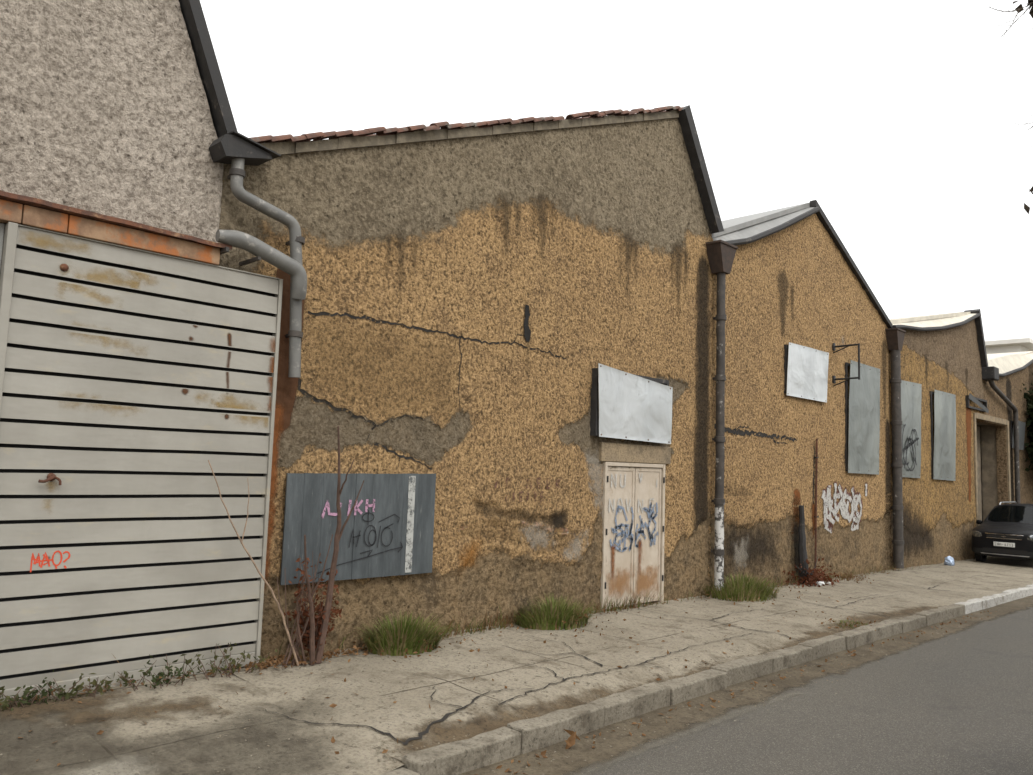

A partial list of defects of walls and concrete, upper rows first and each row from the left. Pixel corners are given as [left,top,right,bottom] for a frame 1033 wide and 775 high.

crack [308,311,566,410]
corrosion [253,268,305,587]
crack [298,378,441,470]
spalling [260,508,606,659]
corrosion [611,540,657,593]